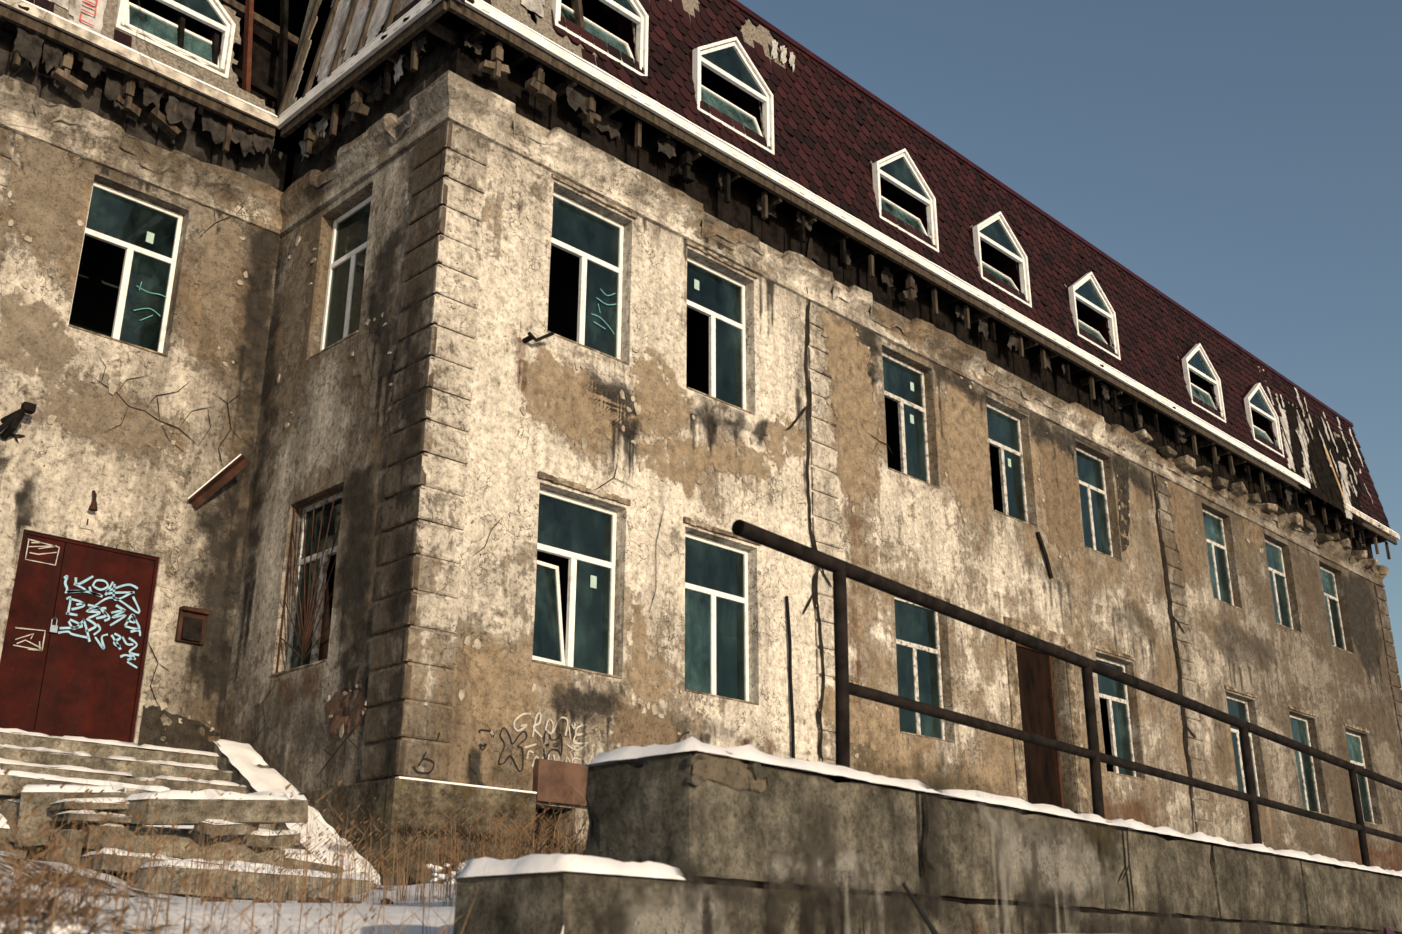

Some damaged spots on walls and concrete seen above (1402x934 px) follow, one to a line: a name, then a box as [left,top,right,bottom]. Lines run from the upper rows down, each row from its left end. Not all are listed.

water stain [588,371,642,472]
peeling [517,340,813,499]
peeling [821,305,883,513]